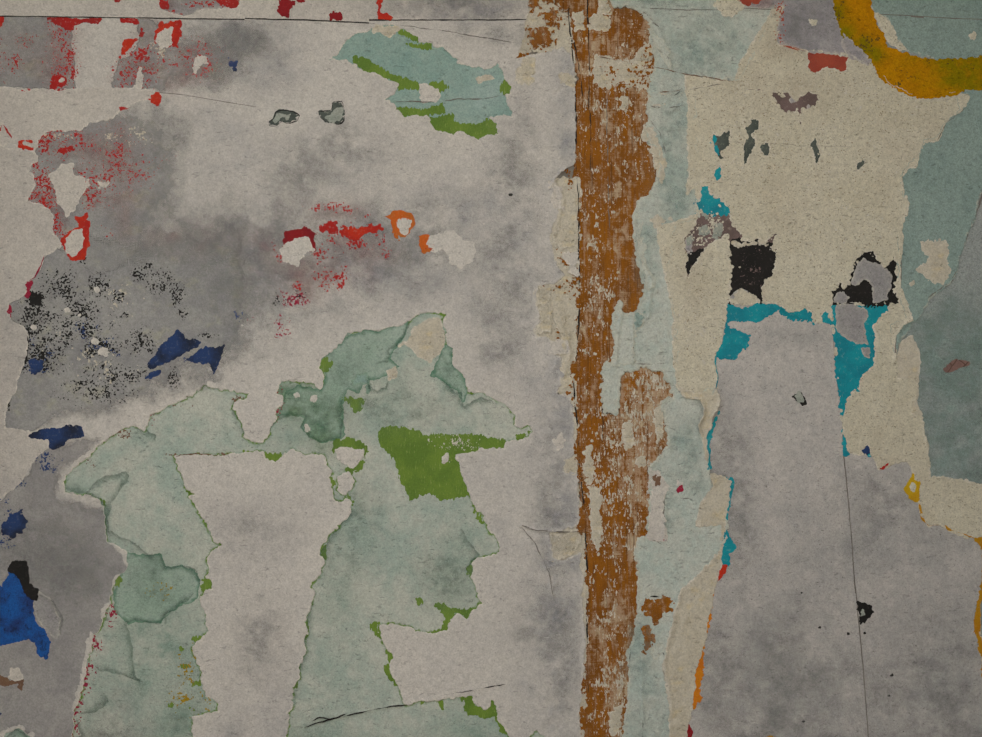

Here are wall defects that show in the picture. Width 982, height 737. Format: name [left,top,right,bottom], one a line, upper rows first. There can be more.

peeling [277,0,305,18]
peeling [376,0,393,21]
peeling [0,17,102,92]
peeling [110,0,256,111]
peeling [271,202,477,292]
peeling [779,306,832,325]
peeling [0,107,253,737]
peeling [718,477,737,581]
crack [842,428,869,737]
peeling [856,601,874,625]
peeling [692,645,705,709]
crack [307,705,405,727]